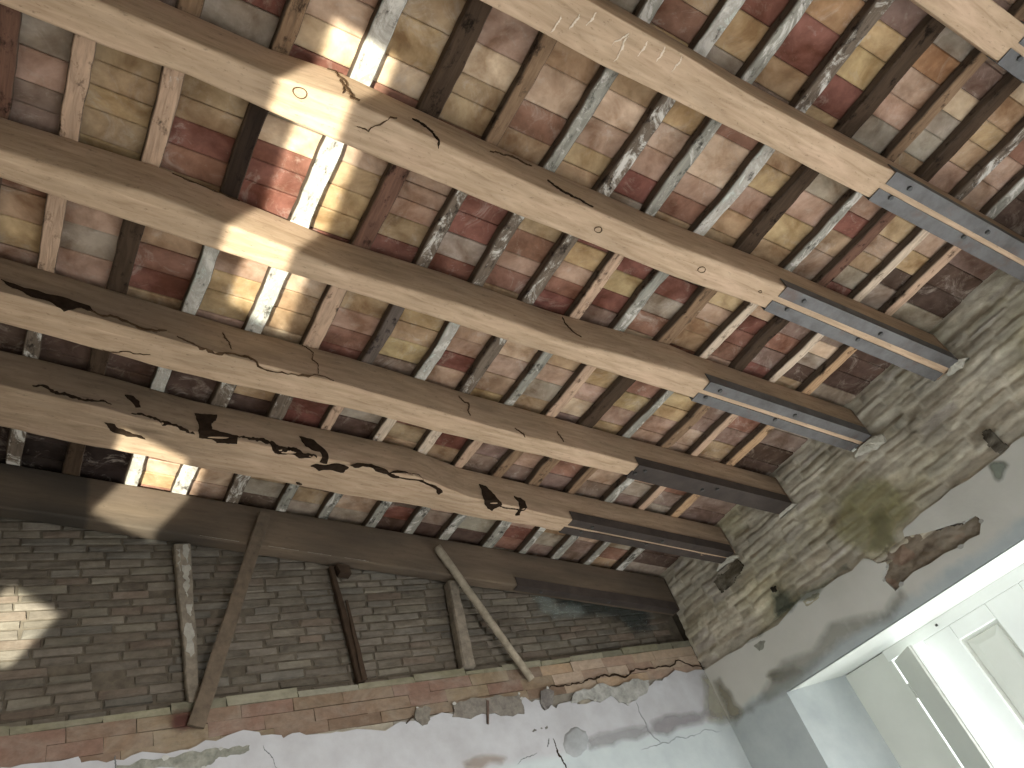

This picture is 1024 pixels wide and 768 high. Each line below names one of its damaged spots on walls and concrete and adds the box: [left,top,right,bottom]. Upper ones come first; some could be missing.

crack [327,68,360,101]
crack [490,151,594,207]
crack [90,309,334,381]
crack [32,384,195,434]
crack [238,436,317,458]
flaking render [873,516,983,589]
crack [549,659,705,688]
flaking render [415,706,431,726]
flaking render [452,692,524,719]
flaking render [540,686,554,710]
flaking render [571,679,649,706]
flaking render [116,745,250,768]